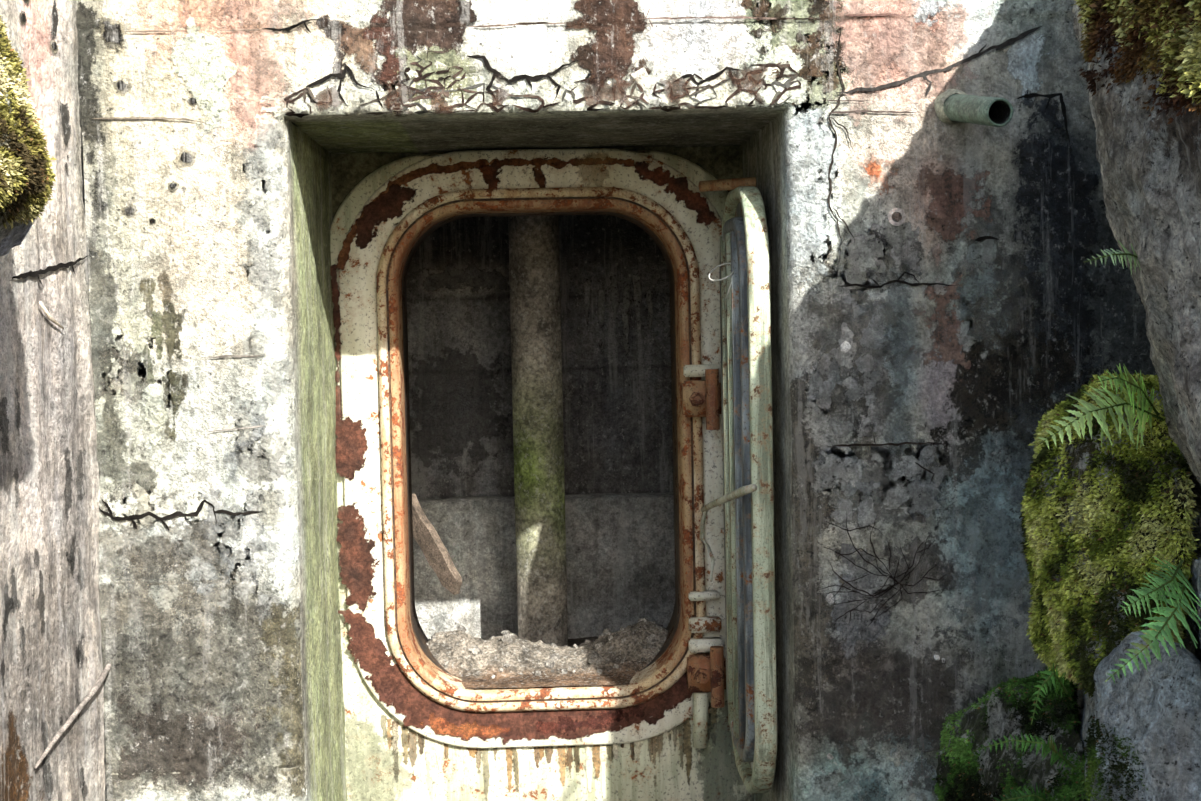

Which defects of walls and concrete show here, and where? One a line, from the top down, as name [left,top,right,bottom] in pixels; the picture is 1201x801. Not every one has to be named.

crack [99,498,262,531]
rust [330,156,716,480]
rust [336,503,718,801]
crack [257,9,1042,288]
crack [827,558,896,597]
peeling [807,212,949,527]
water stain [923,83,1119,484]
crack [1017,93,1070,143]